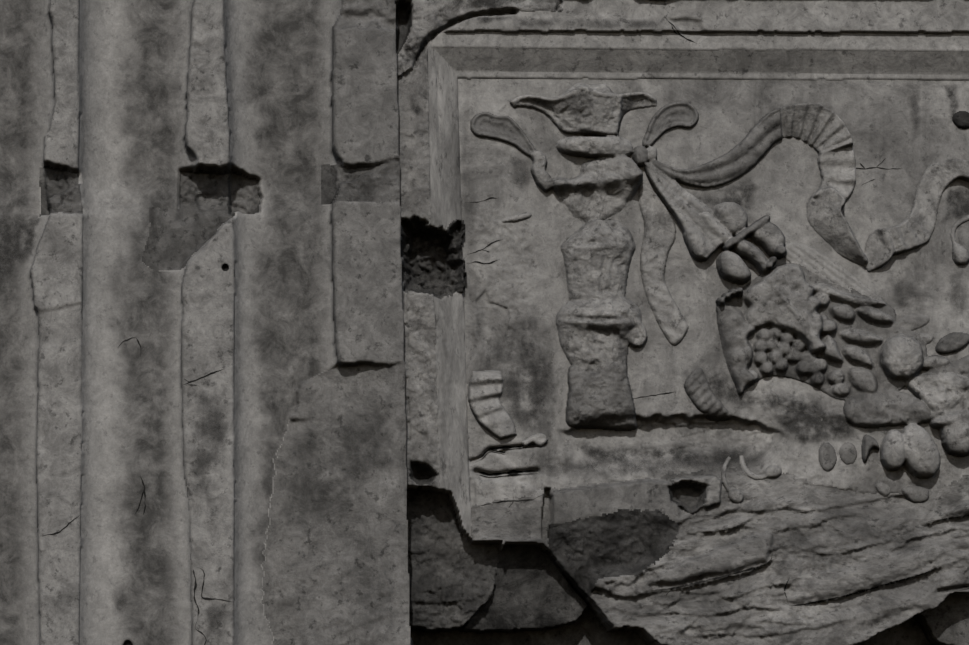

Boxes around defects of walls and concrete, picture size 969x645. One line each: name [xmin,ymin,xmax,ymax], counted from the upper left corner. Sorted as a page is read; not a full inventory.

spalling [395,0,412,54]
spalling [400,207,539,357]
spalling [406,462,969,645]